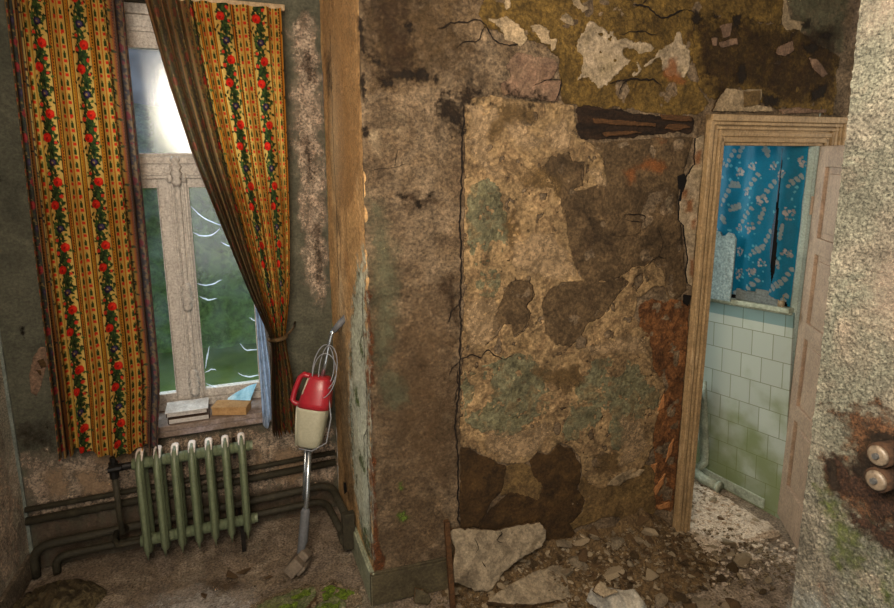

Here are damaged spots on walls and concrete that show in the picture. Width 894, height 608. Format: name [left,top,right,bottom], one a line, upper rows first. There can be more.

water stain [291,0,491,295]
crack [448,107,512,525]
flaking render [459,0,840,541]